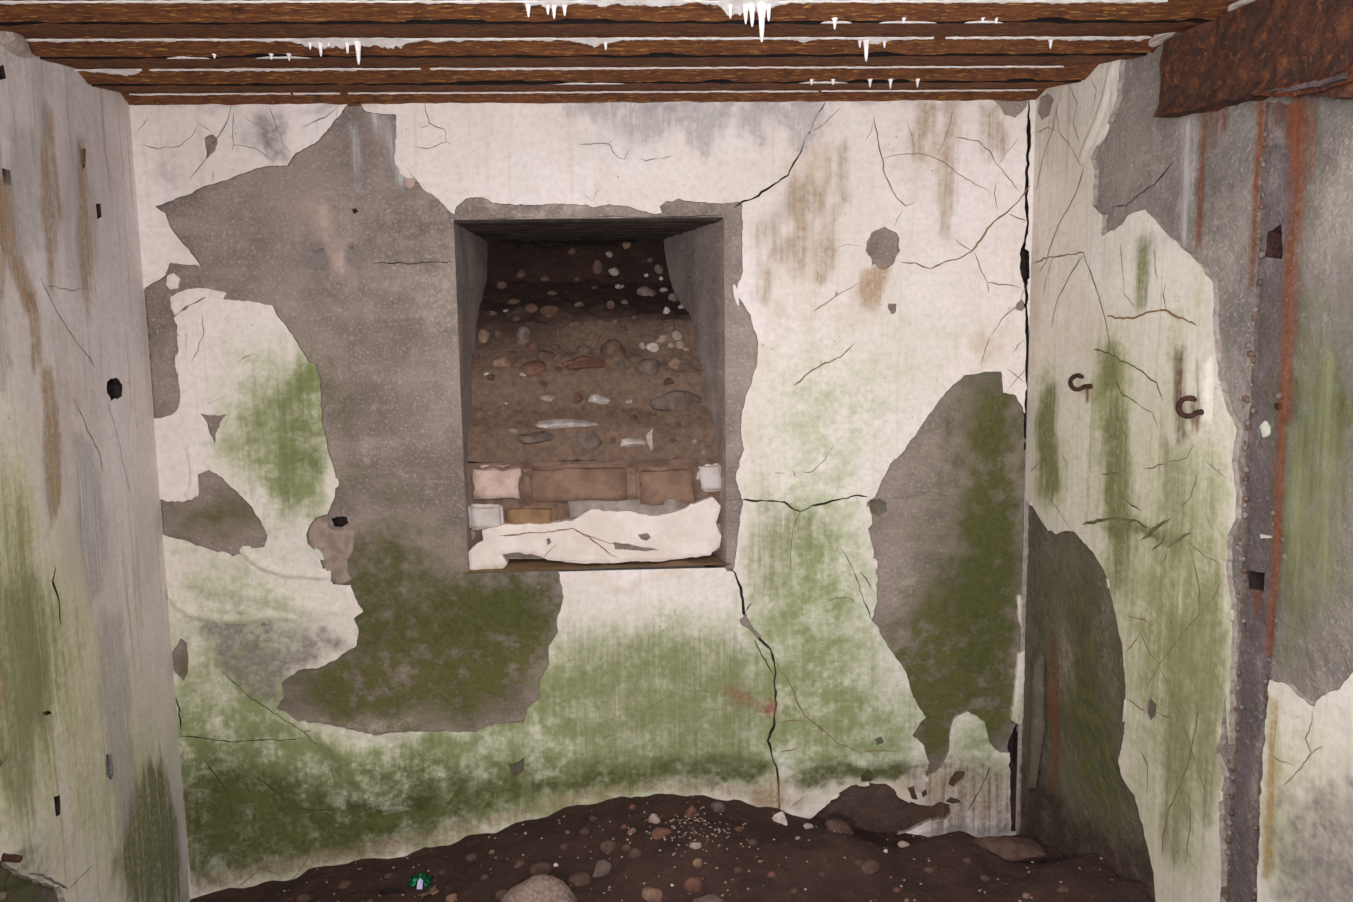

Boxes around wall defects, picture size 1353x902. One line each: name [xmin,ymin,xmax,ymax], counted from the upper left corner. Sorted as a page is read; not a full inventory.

water stain [0,0,1168,150]
crack [734,103,840,208]
water stain [27,292,61,512]
spalling [144,106,758,736]
crack [866,58,1223,862]
corrosion [1174,352,1198,441]
spalling [1091,32,1353,902]
corrosion [1250,98,1314,654]
water stain [206,624,340,696]
crack [731,569,892,807]
spalling [814,371,1155,902]
corrosion [1264,720,1276,876]